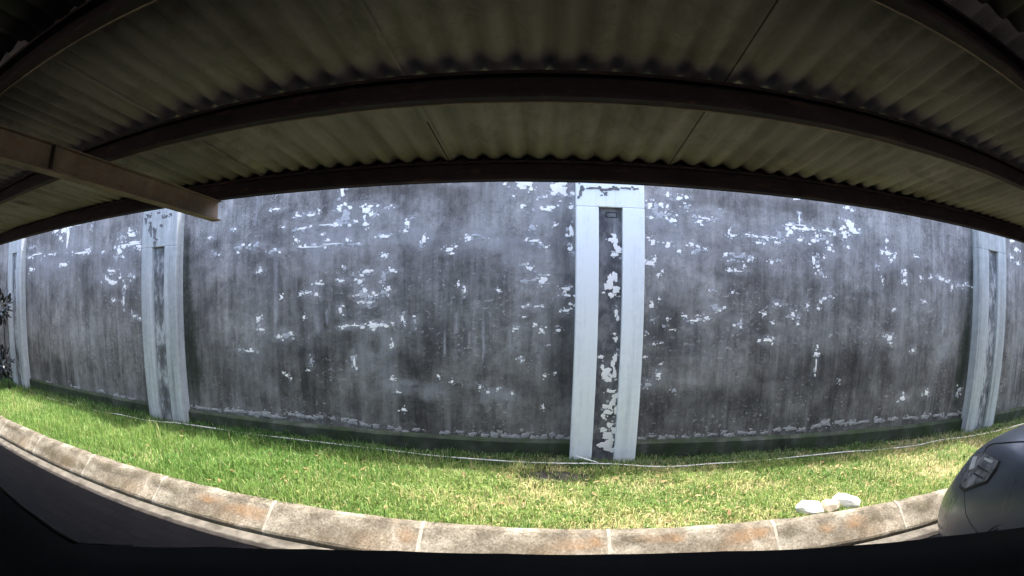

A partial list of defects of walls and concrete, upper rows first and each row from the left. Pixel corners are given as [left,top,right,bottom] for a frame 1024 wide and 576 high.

peeling [26,222,142,322]
peeling [234,188,416,255]
peeling [297,252,417,348]
peeling [441,234,489,255]
peeling [512,262,575,347]
peeling [503,182,722,259]
peeling [645,235,708,279]
peeling [642,288,726,358]
peeling [722,198,862,278]
peeling [757,292,835,345]
peeling [875,233,973,291]
peeling [596,271,621,453]